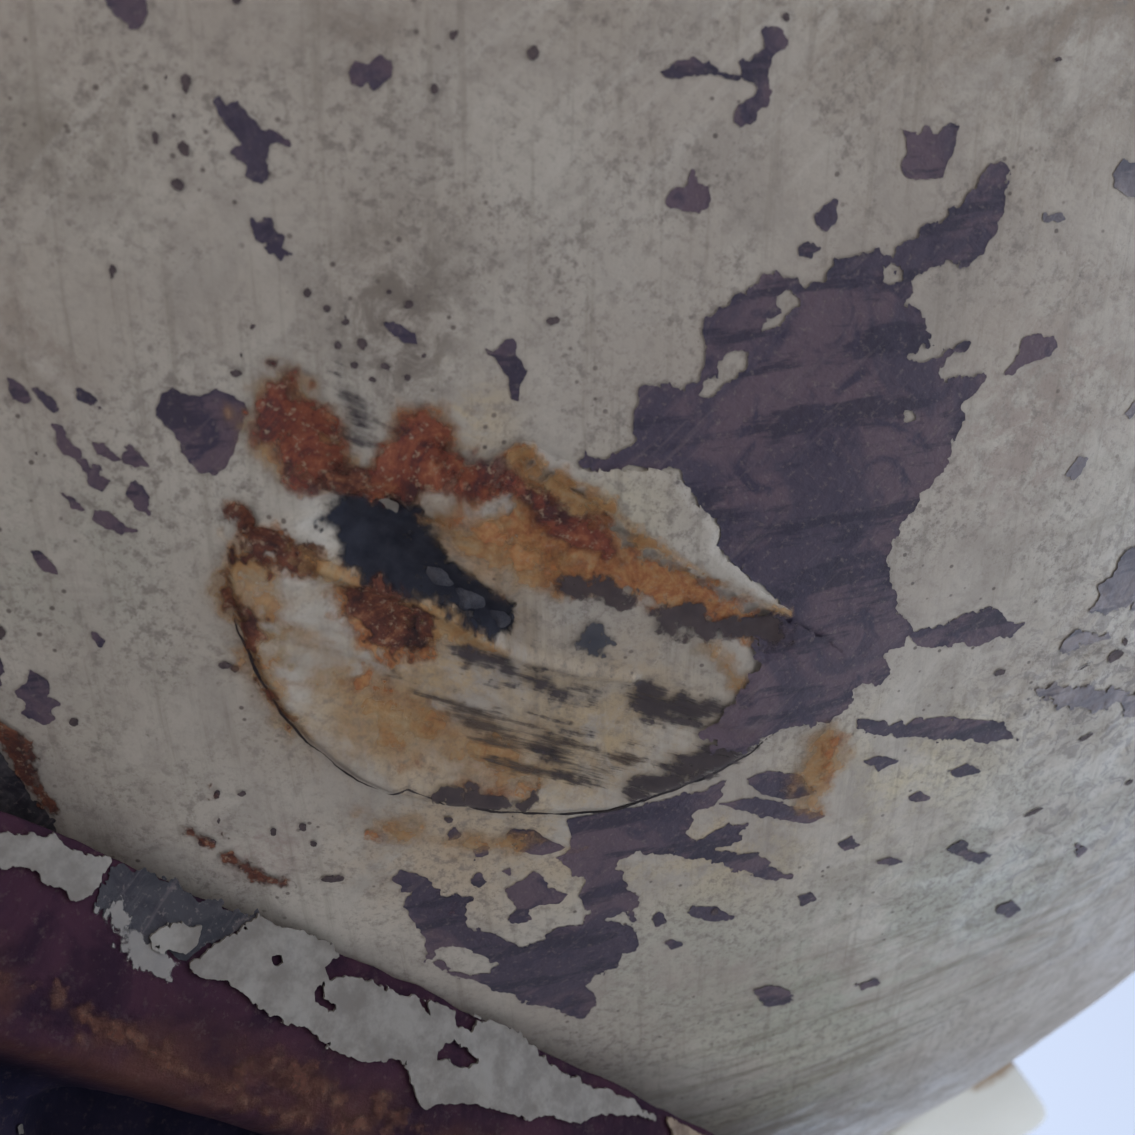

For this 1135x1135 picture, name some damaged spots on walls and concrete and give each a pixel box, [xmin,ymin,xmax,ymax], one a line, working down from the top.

peeling [661,12,790,128]
peeling [213,96,291,184]
peeling [156,387,249,476]
rust [243,360,760,622]
peeling [521,161,1025,756]
rust [213,501,541,799]
rust [794,728,851,815]
peeling [0,831,112,902]
rust [182,828,290,888]
peeling [392,771,825,1019]
rust [54,979,208,1080]
rust [223,1055,348,1124]